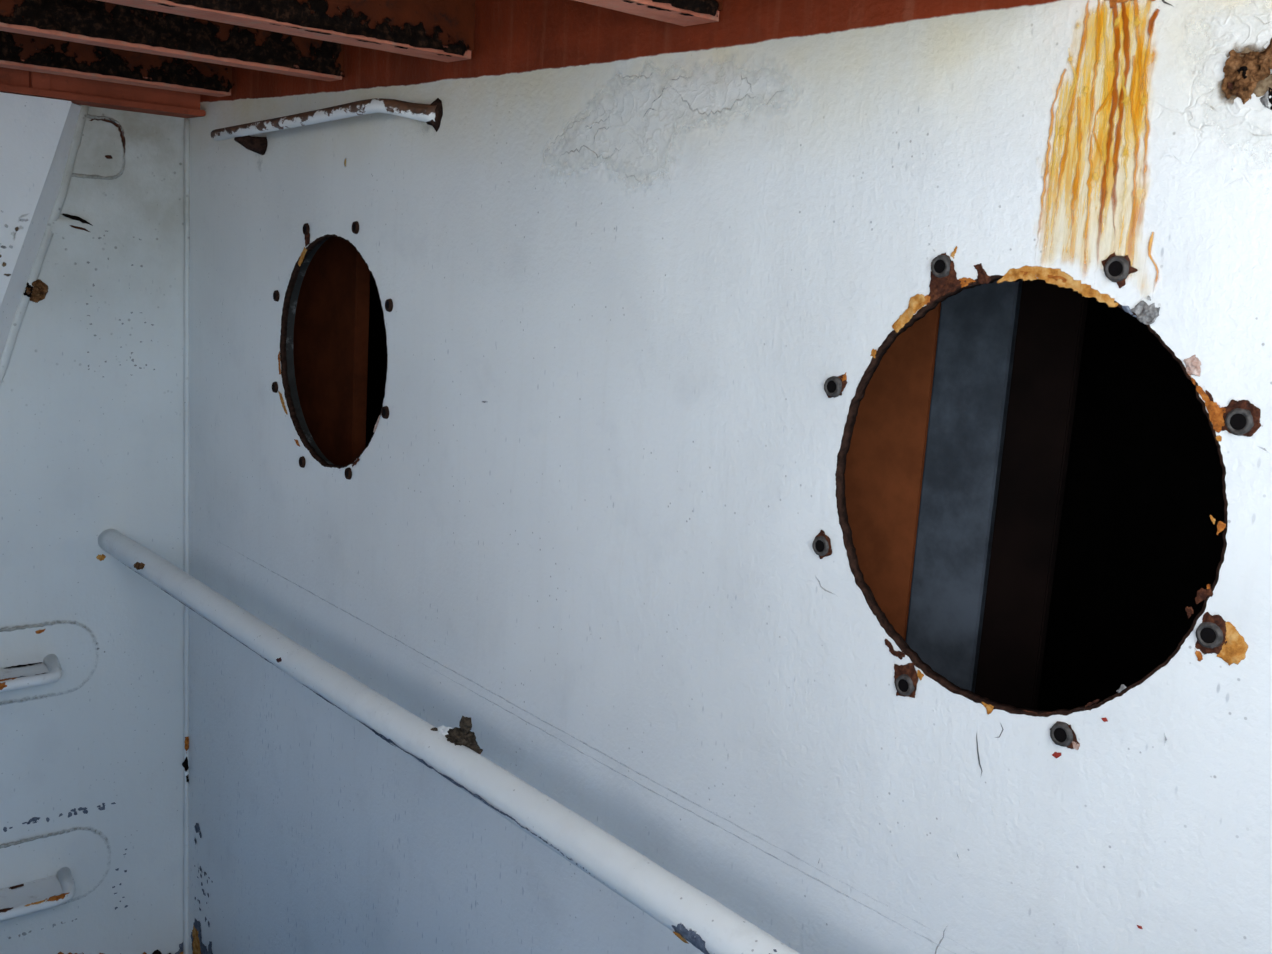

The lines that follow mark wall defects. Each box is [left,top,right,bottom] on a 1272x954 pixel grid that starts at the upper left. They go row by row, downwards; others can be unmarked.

spalling [1219,38,1272,110]
rust [892,0,1159,333]
rust [24,279,48,303]
rust [1185,584,1248,666]
peeling [672,923,709,954]